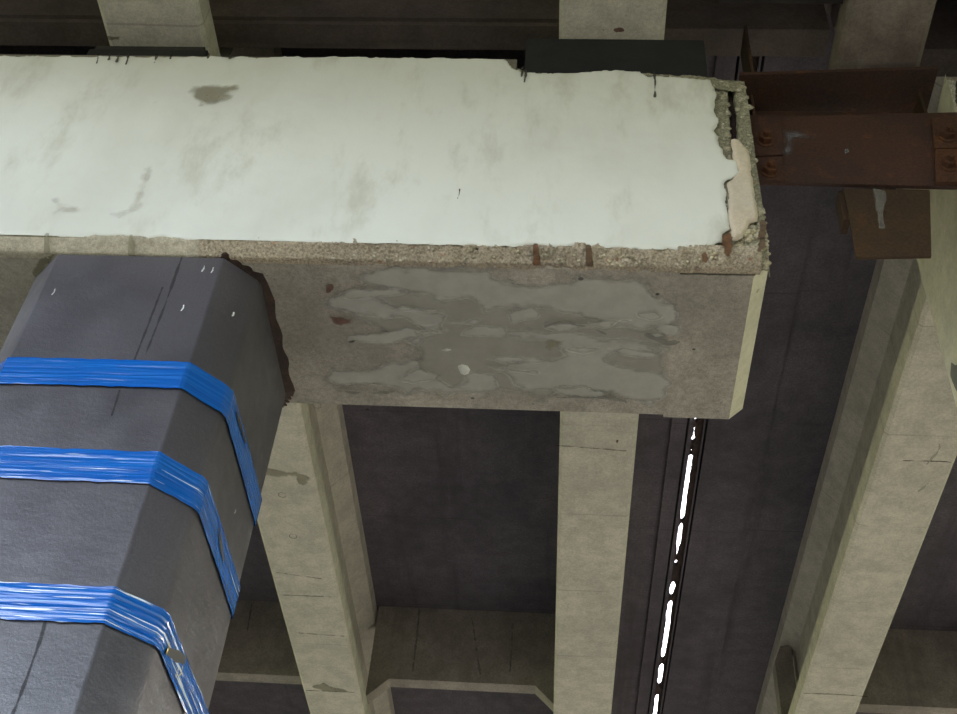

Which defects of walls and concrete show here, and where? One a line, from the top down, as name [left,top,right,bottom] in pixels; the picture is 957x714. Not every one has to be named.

water stain [195,86,236,102]
spalling [199,73,771,405]
corrosion [585,245,594,267]
water stain [266,468,309,485]